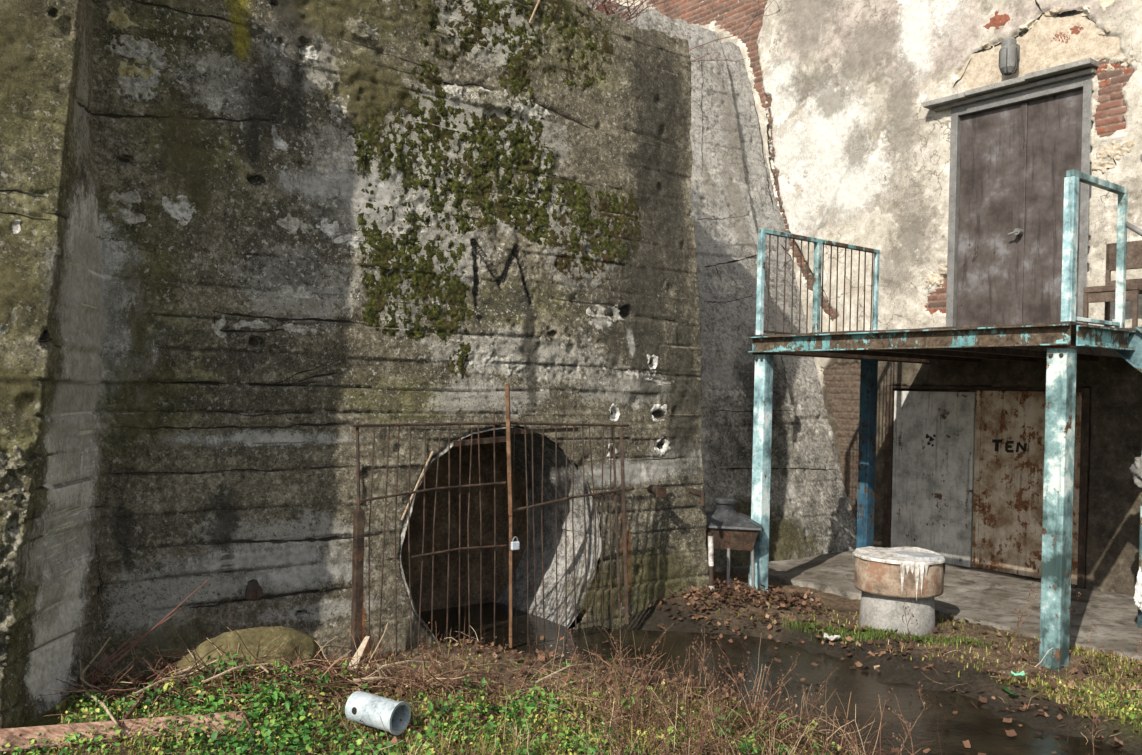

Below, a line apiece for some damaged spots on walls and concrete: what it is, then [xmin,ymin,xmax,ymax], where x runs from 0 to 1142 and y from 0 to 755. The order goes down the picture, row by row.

damp [233,0,311,163]
damp [323,69,391,123]
crack [953,0,1096,87]
flaking render [1050,0,1115,44]
flaking render [1091,58,1135,174]
flaking render [647,0,839,321]
crack [699,83,827,303]
crack [554,298,677,322]
spalling [613,362,674,386]